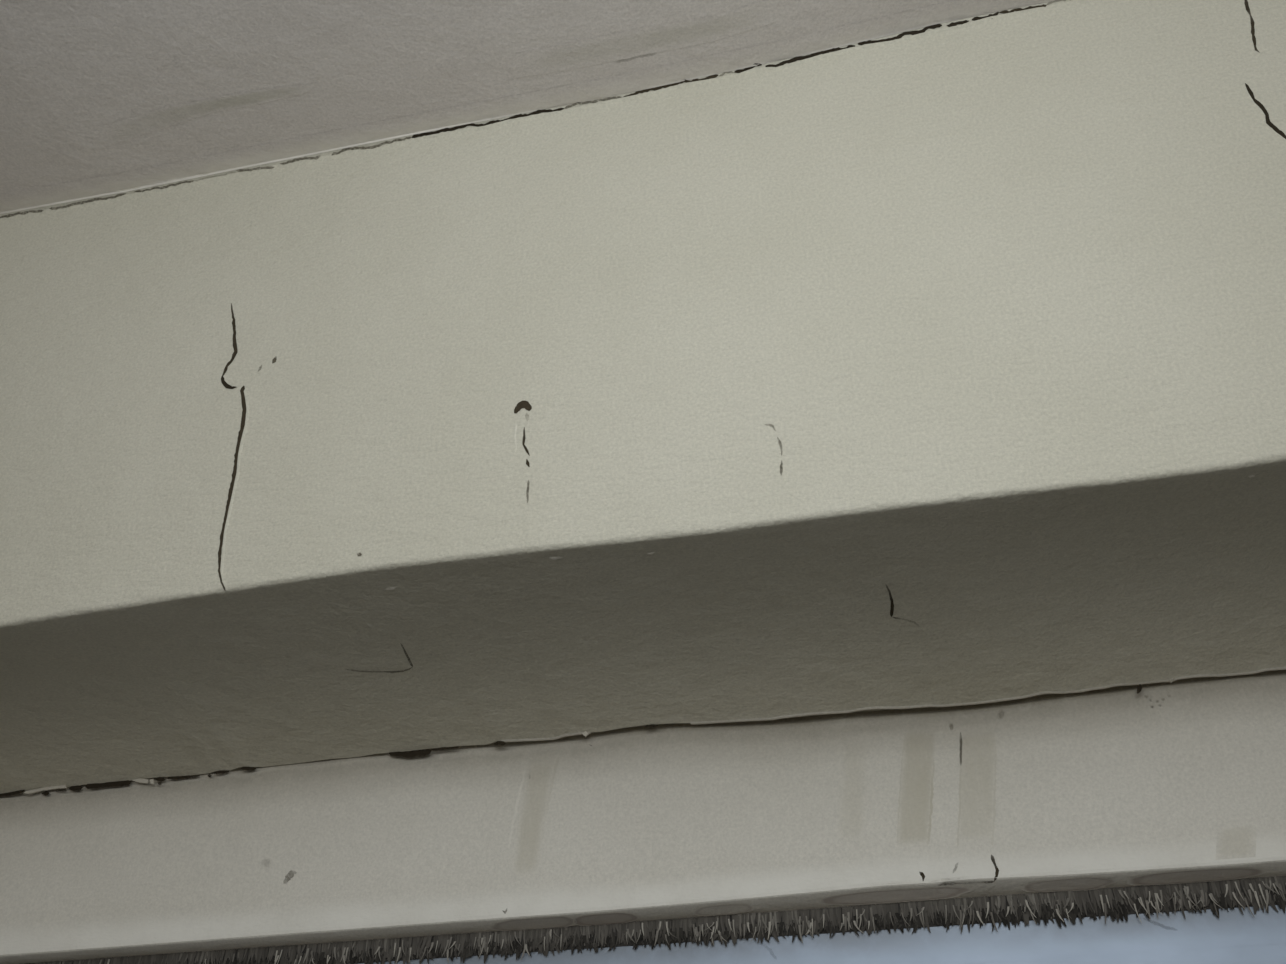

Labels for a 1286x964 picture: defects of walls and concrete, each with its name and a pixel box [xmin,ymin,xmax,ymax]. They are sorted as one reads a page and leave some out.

crack [1244,0,1260,53]
crack [239,4,1047,172]
crack [1243,83,1286,142]
crack [0,180,194,218]
crack [218,303,277,590]
crack [887,588,896,619]
crack [388,647,413,673]
crack [389,746,459,758]
crack [0,767,256,797]